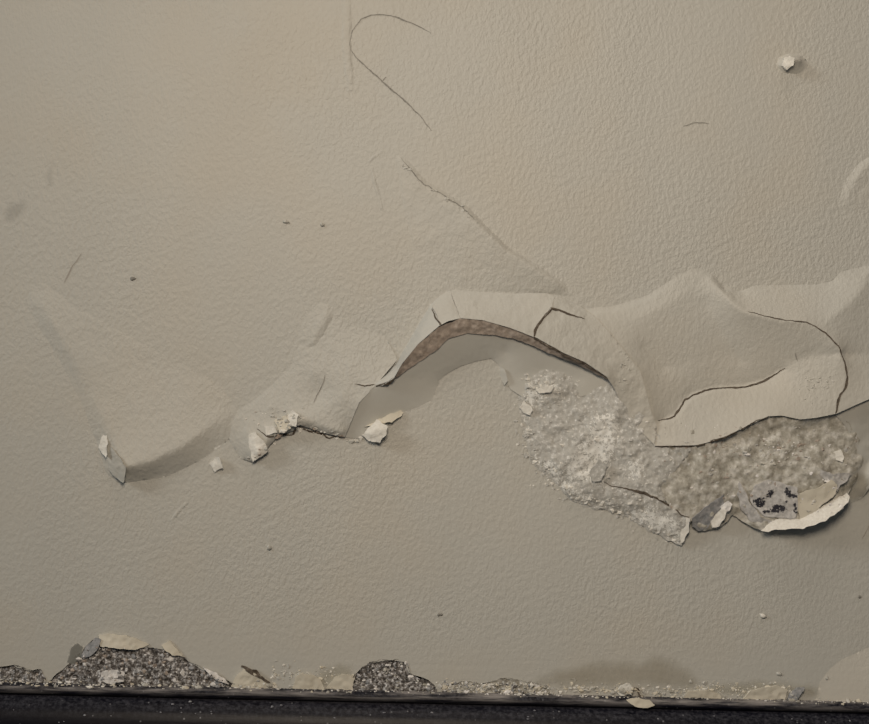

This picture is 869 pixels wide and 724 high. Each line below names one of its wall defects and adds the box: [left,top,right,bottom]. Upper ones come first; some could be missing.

crack [349,14,432,131]
peeling [229,290,666,462]
spalling [661,400,869,544]
spalling [0,633,869,708]